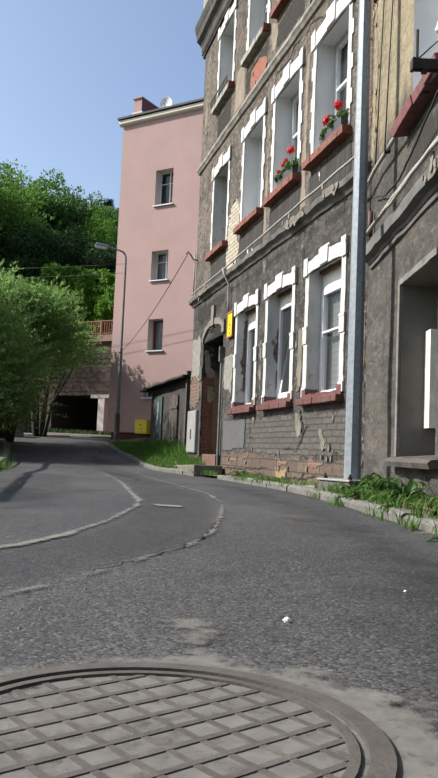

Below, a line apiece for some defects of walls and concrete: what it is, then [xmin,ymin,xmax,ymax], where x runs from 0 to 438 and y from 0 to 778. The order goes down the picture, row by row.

flaking render [234,23,278,114]
flaking render [225,198,241,269]
flaking render [189,320,346,485]